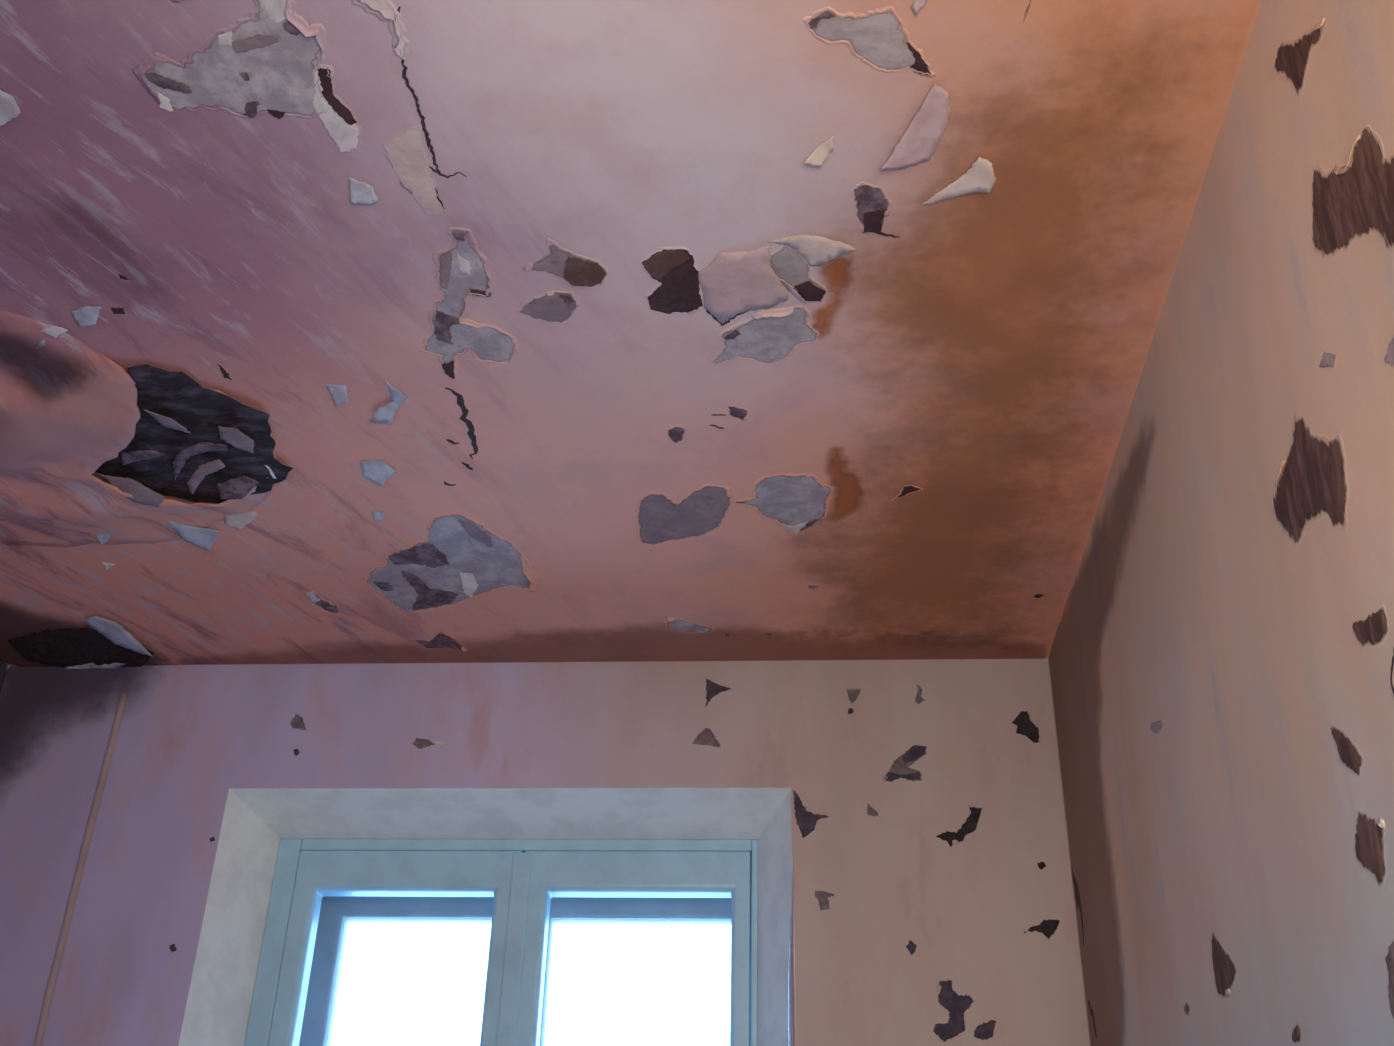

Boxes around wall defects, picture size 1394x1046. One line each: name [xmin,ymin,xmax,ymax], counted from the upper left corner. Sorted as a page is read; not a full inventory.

peeling [131,0,363,154]
crack [395,6,466,209]
peeling [802,0,951,234]
peeling [1311,124,1394,261]
peeling [640,234,857,366]
peeling [363,511,539,614]
crack [444,387,478,486]
peeling [634,473,834,546]
peeling [1271,412,1349,551]
leakage [0,606,161,769]
peeling [1354,809,1387,892]
peeling [932,979,997,1043]